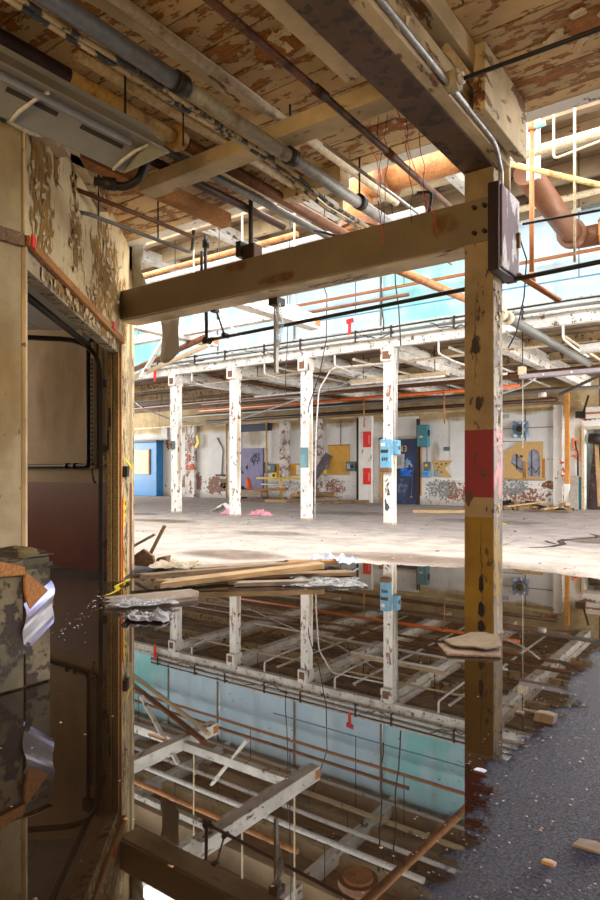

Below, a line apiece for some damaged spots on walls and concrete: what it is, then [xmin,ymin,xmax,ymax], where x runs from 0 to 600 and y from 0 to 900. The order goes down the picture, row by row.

peeling [249,26,311,70]
peeling [543,6,600,52]
peeling [28,135,128,349]
peeling [476,283,505,346]
peeling [469,333,481,357]
spalling [197,472,235,502]
peeling [421,479,465,502]
peeling [495,480,553,514]
crack [480,523,600,602]
peeling [478,574,486,632]